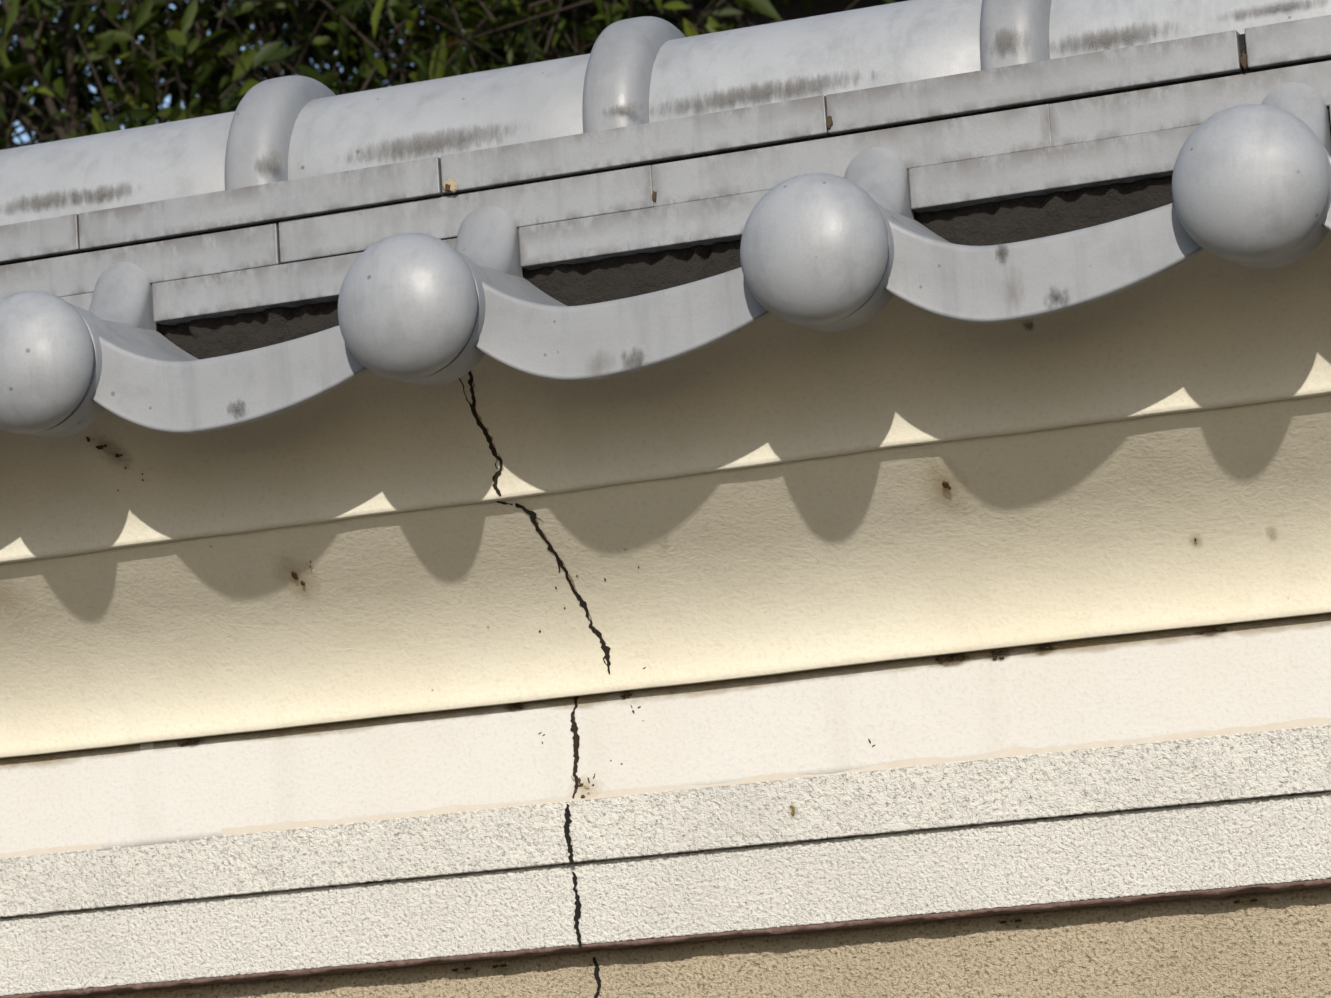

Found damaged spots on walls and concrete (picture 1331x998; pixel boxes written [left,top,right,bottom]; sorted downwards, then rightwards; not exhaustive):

crack [459,371,611,674]
crack [563,697,601,998]